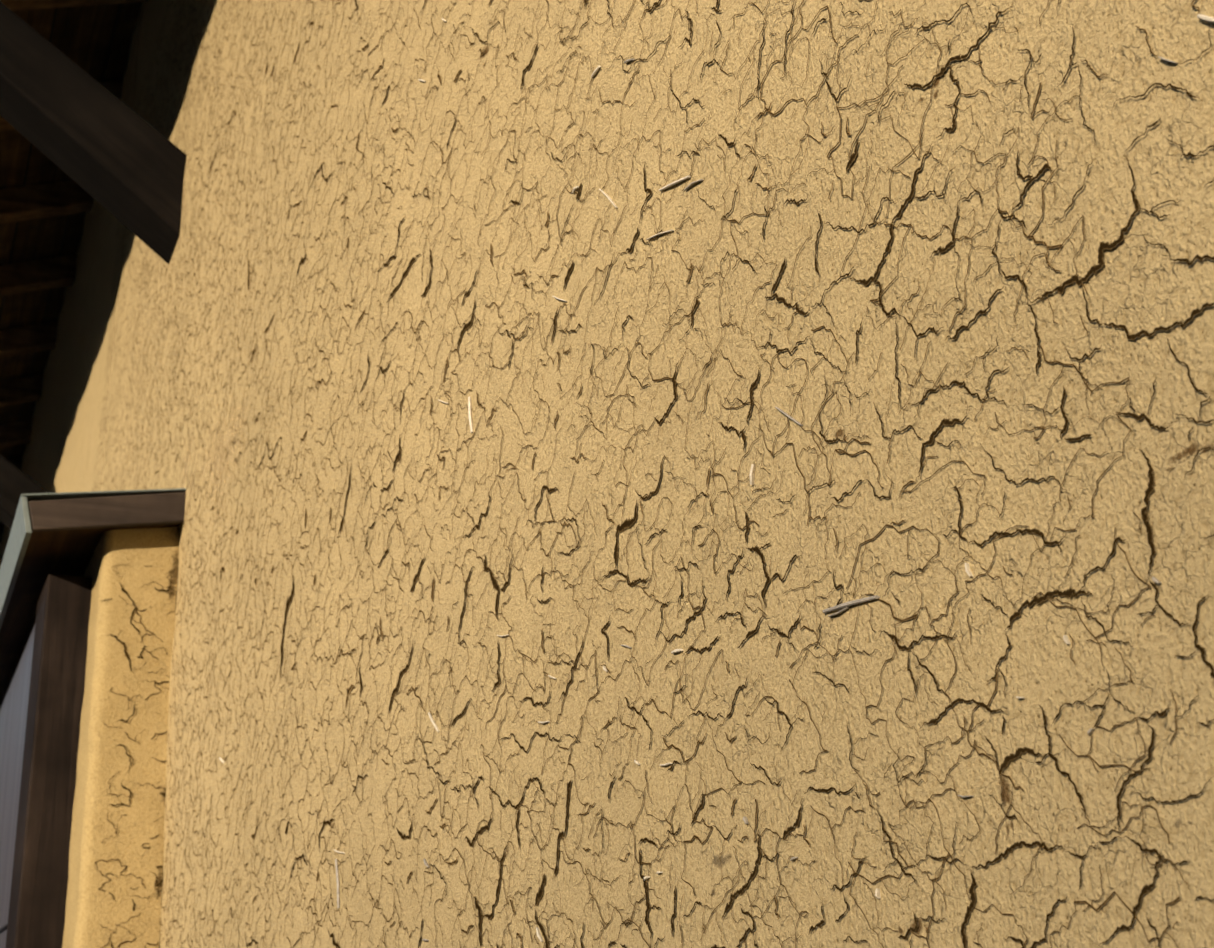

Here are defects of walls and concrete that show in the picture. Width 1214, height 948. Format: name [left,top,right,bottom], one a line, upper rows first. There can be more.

crack [706,0,722,34]
crack [1113,0,1211,107]
crack [1166,137,1214,157]
crack [783,195,808,208]
crack [1167,338,1214,440]
crack [110,631,135,672]
crack [1169,689,1199,744]
crack [101,744,135,843]
crack [804,785,860,799]
crack [95,858,150,948]
crack [669,875,683,937]
crack [679,799,864,948]